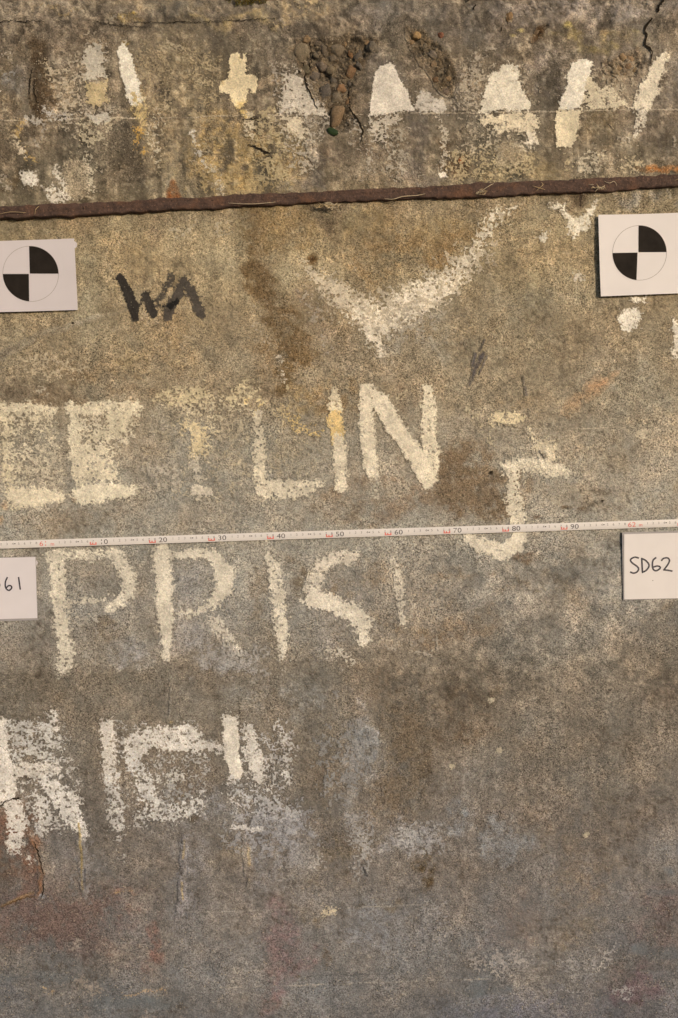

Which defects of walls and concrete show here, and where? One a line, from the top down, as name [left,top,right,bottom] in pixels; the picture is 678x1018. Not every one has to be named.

crack [644,0,664,64]
crack [2,843,44,907]